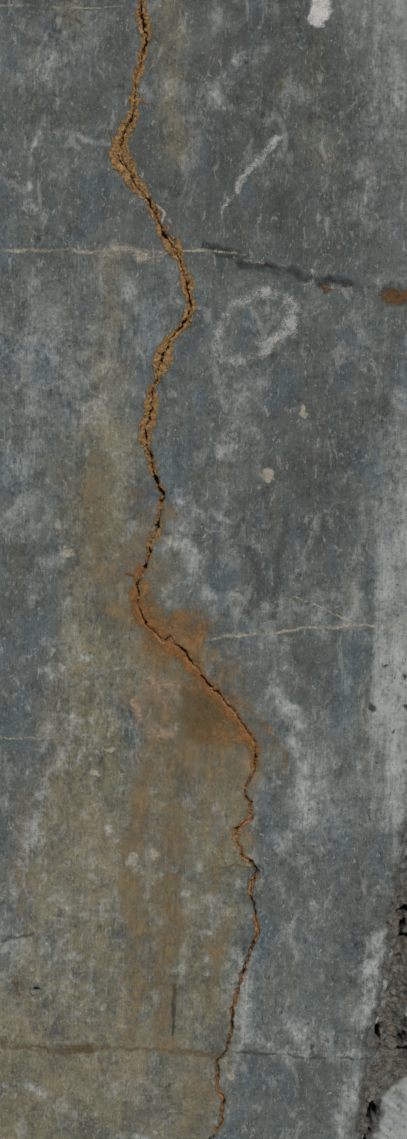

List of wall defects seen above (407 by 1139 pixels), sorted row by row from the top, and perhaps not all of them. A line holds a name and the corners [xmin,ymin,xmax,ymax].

crack [1,0,324,1139]
rust [122,510,261,783]
spalling [356,817,407,1139]